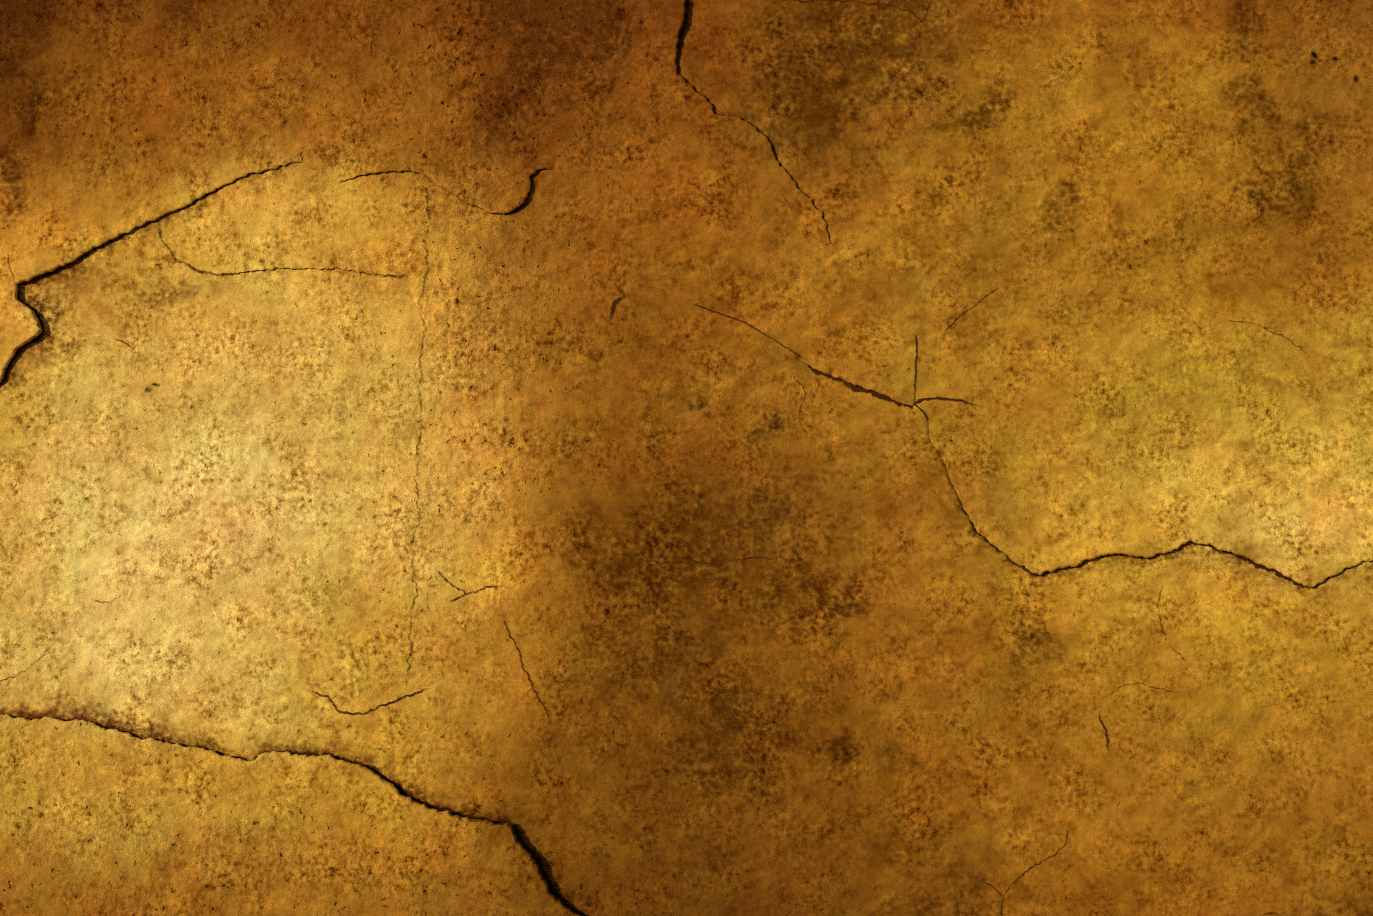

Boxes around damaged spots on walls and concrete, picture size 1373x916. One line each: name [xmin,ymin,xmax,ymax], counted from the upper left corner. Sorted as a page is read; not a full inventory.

crack [158,227,238,275]
crack [473,172,537,214]
crack [613,0,831,245]
crack [694,290,995,432]